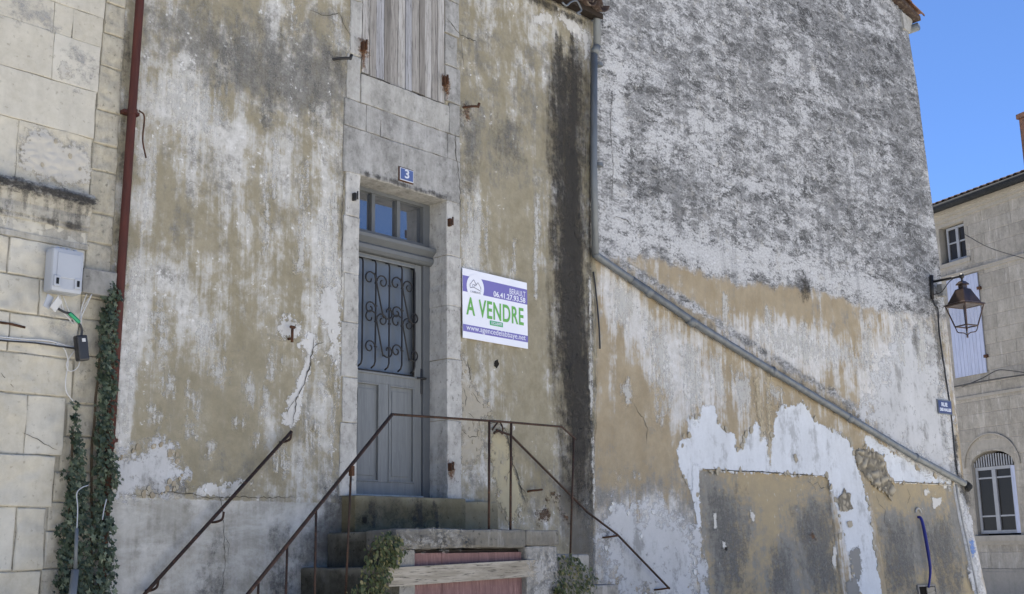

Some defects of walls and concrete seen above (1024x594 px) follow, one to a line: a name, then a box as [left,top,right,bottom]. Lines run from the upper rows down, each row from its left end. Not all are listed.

leakage [293,161,310,274]
leakage [460,110,489,271]
leakage [531,0,755,594]
peeling [113,375,245,504]
peeling [245,347,283,419]
crack [287,341,325,429]
peeling [676,374,954,594]
leakage [756,306,970,509]